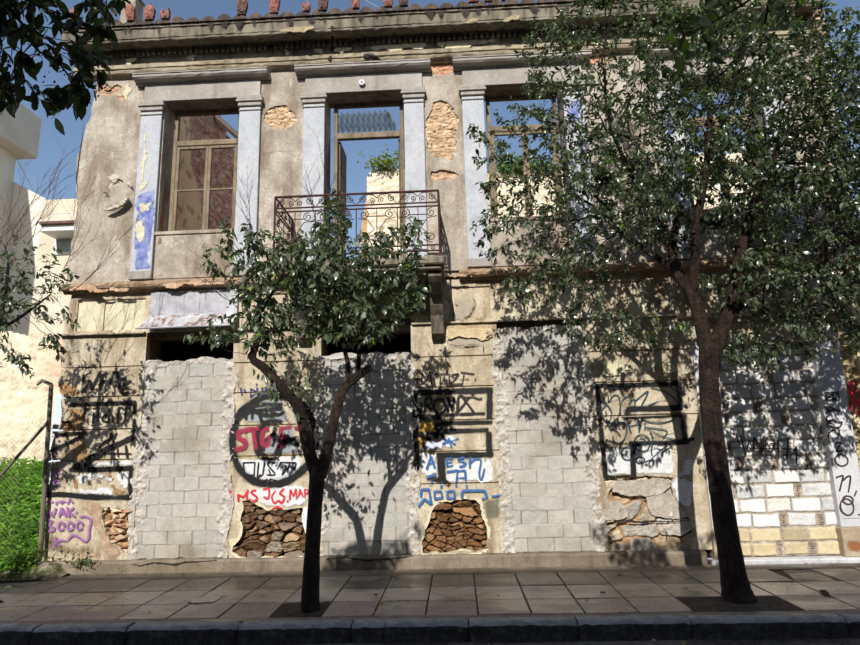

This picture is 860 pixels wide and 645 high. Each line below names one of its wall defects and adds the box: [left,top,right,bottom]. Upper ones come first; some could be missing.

flaking render [97,83,131,102]
flaking render [264,106,298,129]
flaking render [425,101,459,160]
flaking render [431,170,458,182]
flaking render [70,284,129,292]
peeling [444,298,493,346]
flaking render [58,383,79,397]
flaking render [61,409,83,431]
peeling [605,445,694,506]
flaking render [72,442,131,560]
peeling [248,485,308,533]
peeling [229,527,243,552]